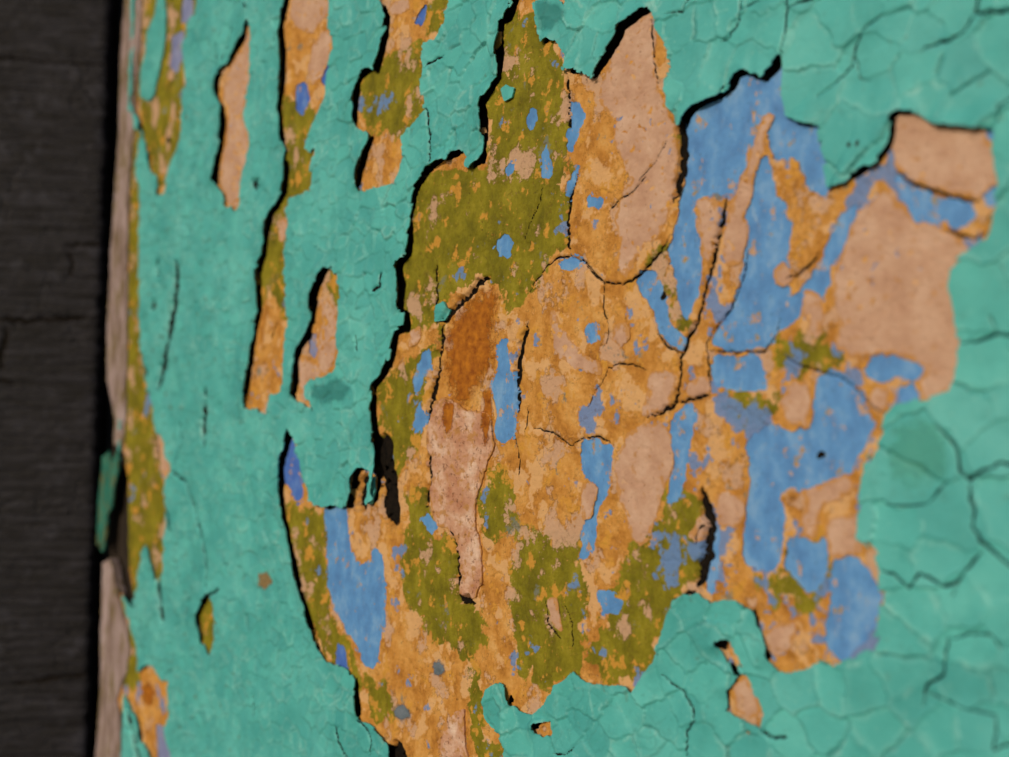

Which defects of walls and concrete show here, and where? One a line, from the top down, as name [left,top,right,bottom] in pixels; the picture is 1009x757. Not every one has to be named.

peeling [96,0,196,757]
peeling [217,26,250,211]
peeling [243,0,340,414]
crack [515,323,614,475]
crack [565,79,573,128]
crack [530,174,673,404]
peeling [278,0,998,757]
crack [608,121,690,213]
crack [647,197,885,418]
peeling [198,594,216,655]
crack [685,487,717,595]
crack [881,426,1009,598]